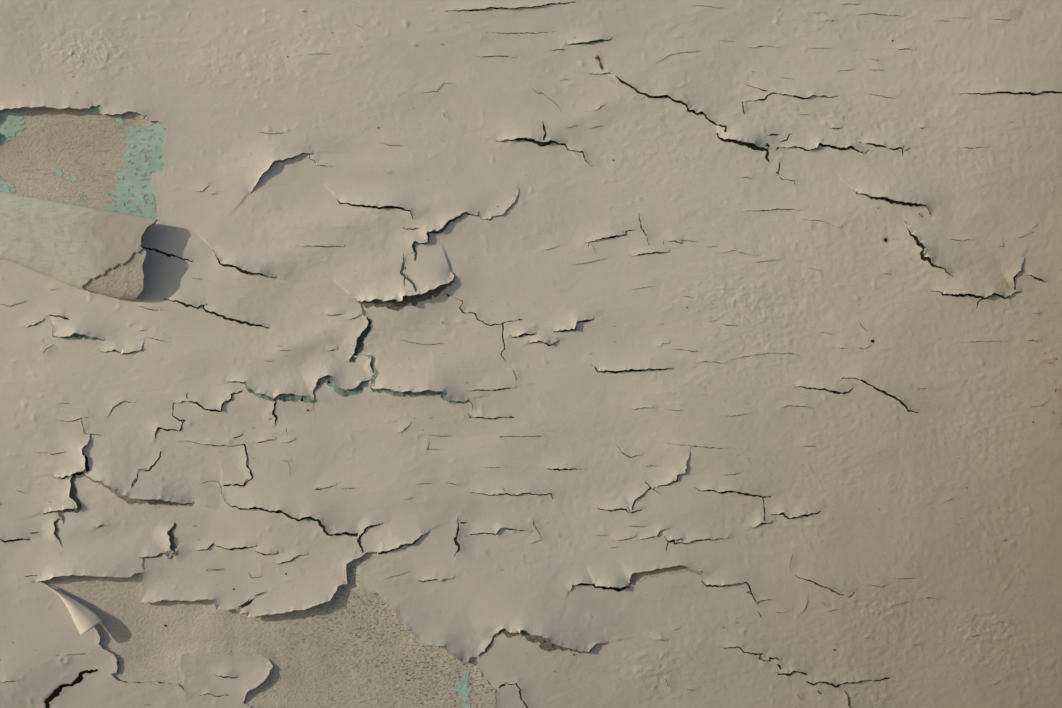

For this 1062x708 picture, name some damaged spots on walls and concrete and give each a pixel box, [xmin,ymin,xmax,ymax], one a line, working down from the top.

peeling [0,101,170,300]
crack [44,669,98,708]
peeling [34,547,502,708]